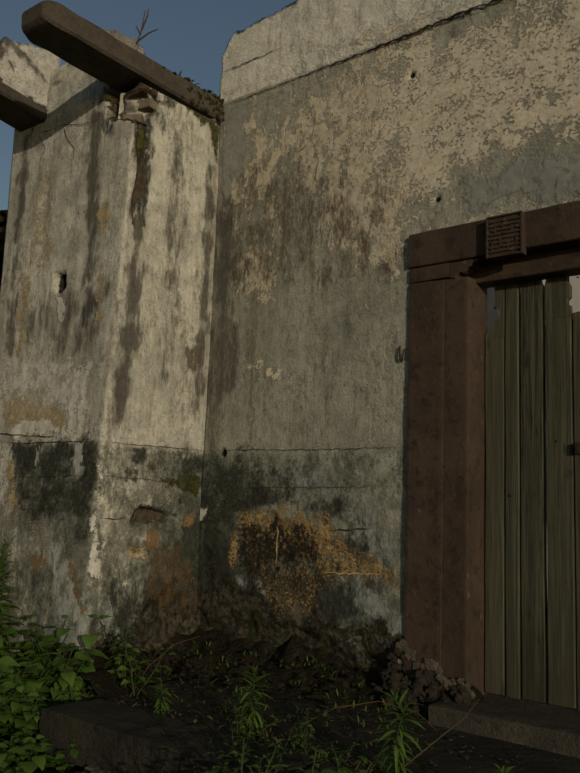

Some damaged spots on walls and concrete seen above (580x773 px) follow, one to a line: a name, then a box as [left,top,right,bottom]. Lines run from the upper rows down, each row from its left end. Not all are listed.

crack [35,119,98,158]
damp [130,96,175,226]
peeling [219,0,580,308]
peeling [2,390,72,431]
damp [12,437,100,521]
damp [124,447,156,482]
spalling [116,504,208,560]
damp [173,445,405,664]
flaking render [228,504,403,620]
damp [52,579,90,652]
damp [99,577,164,645]